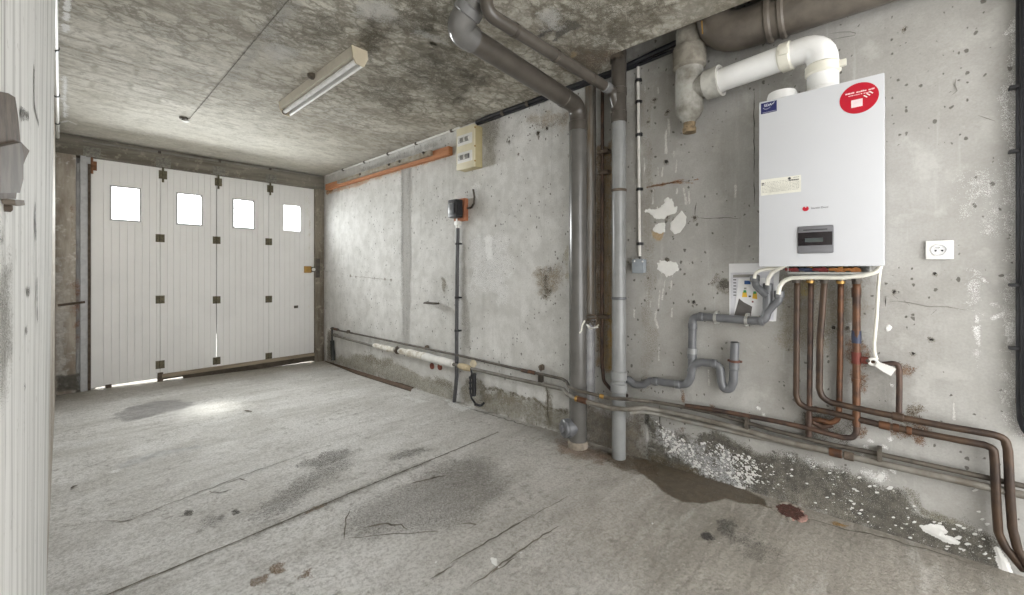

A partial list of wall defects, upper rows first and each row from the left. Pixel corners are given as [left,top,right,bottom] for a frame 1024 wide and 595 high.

water stain [283,0,499,115]
water stain [533,246,569,301]
water stain [107,399,195,423]
crack [106,387,568,595]
water stain [327,330,1006,568]